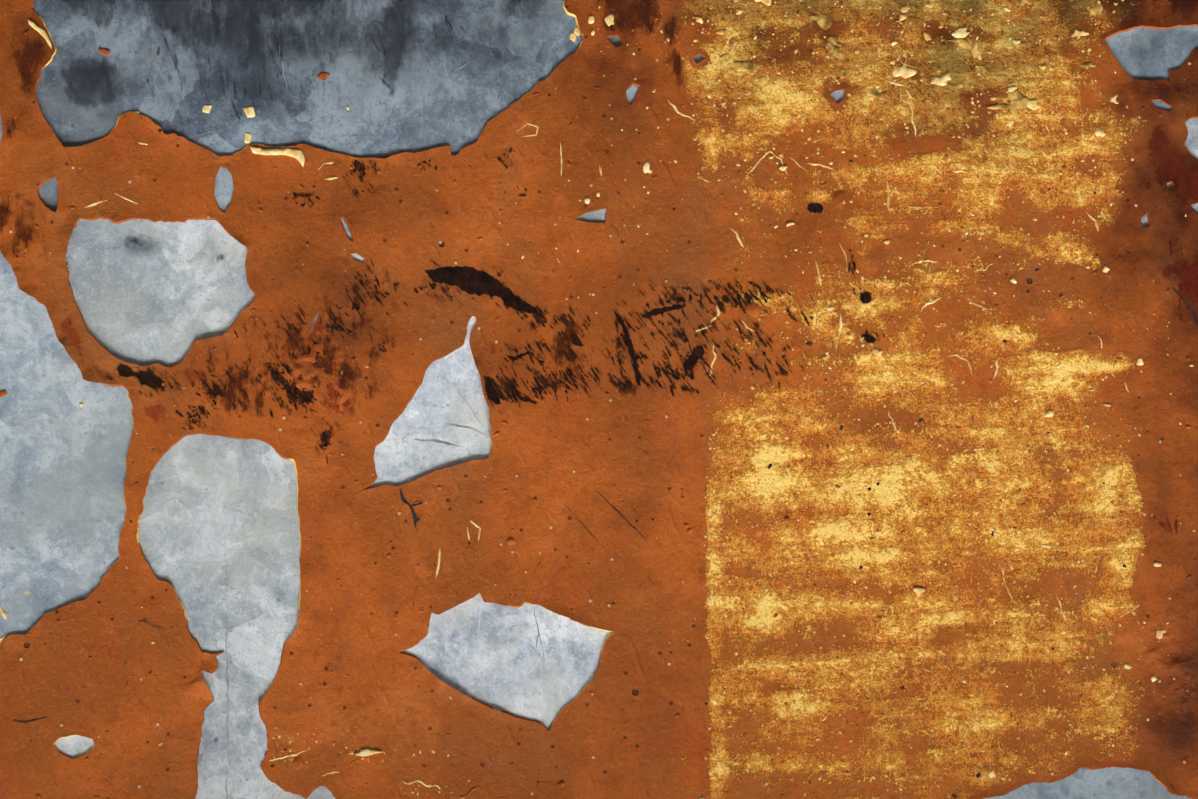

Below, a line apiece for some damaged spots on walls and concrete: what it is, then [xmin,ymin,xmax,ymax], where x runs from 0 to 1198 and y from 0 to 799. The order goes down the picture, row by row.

peeling [0,0,632,799]
peeling [617,74,649,115]
peeling [660,0,1198,799]